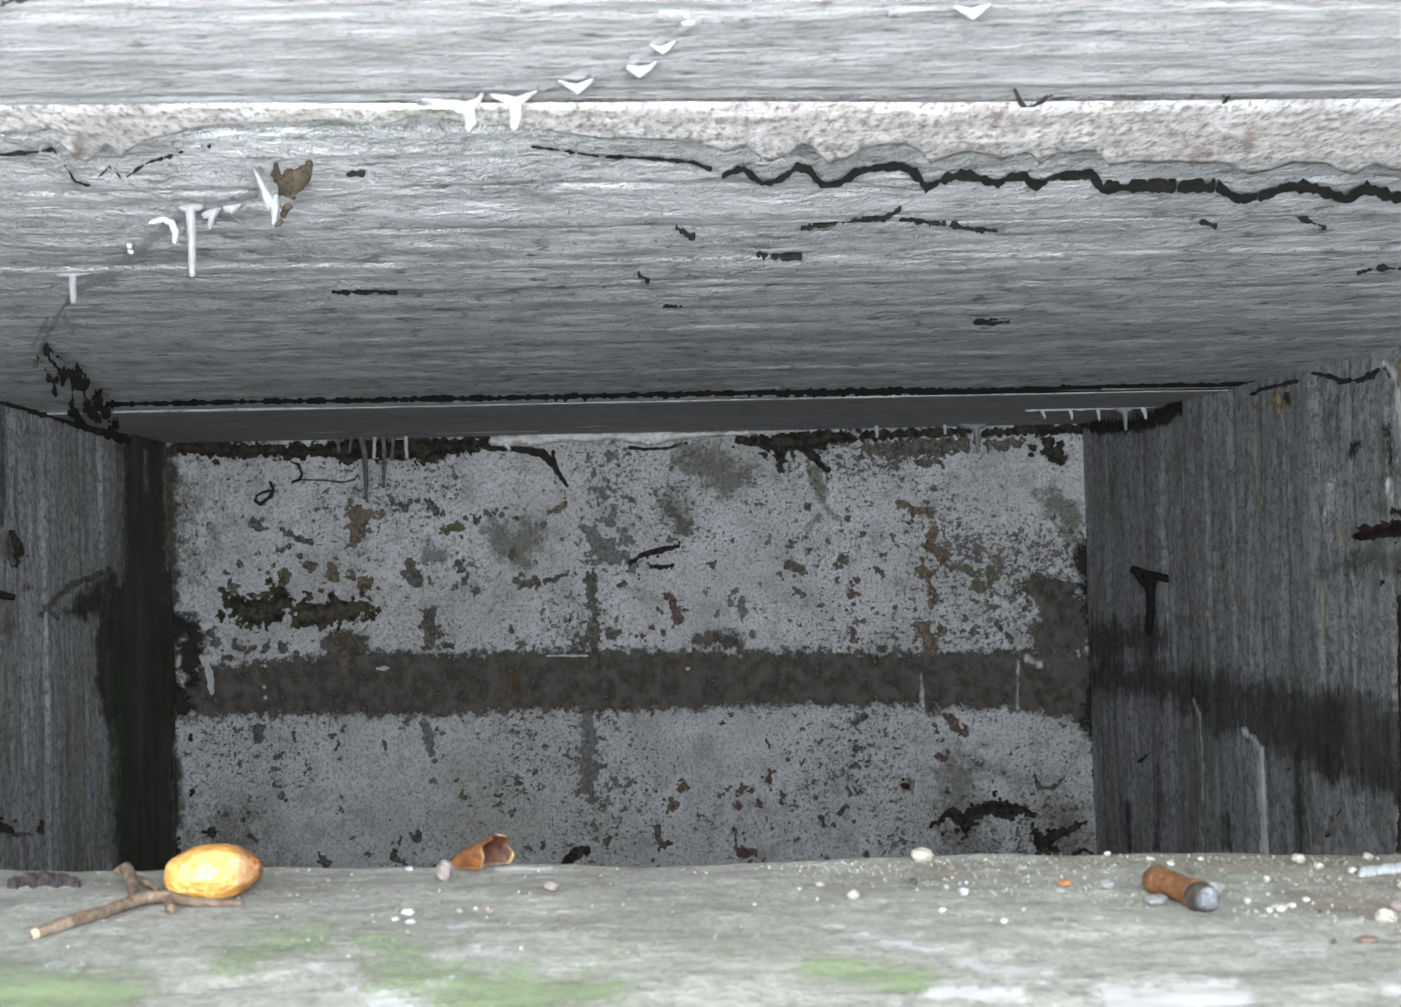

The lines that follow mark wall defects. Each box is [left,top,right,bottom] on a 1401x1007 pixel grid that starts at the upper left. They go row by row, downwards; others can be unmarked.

crack [417,8,777,106]
crack [1014,88,1053,108]
crack [0,144,211,187]
crack [346,169,365,178]
crack [531,146,1401,262]
crack [32,189,258,369]
crack [332,288,398,296]
crack [487,446,568,487]
crack [0,367,1392,444]
leakage [1382,360,1401,509]
spalling [166,424,1083,673]
leakage [64,434,1401,872]